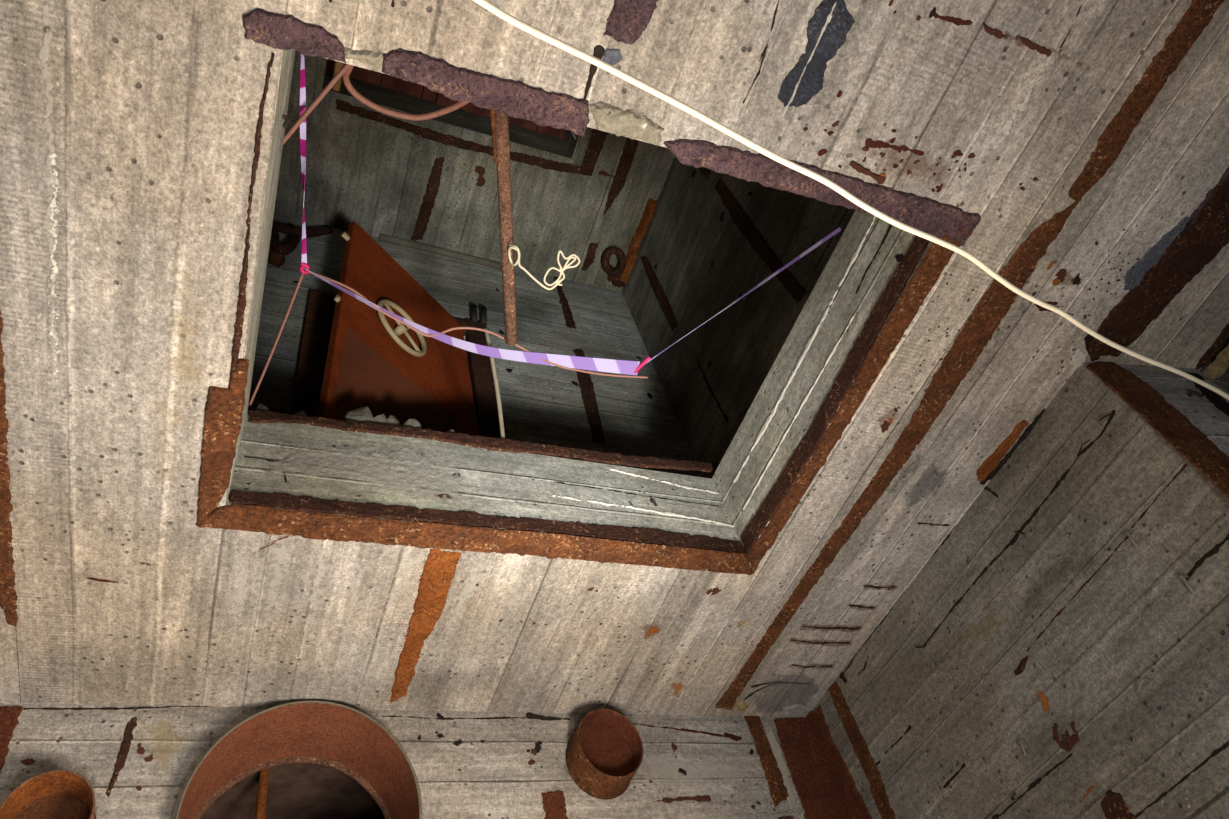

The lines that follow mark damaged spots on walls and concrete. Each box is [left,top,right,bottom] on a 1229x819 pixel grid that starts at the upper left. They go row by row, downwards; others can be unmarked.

rust [1046,225,1139,300]
rust [880,401,908,434]
rust [791,626,861,644]
rust [1014,655,1028,676]
rust [1081,785,1136,819]